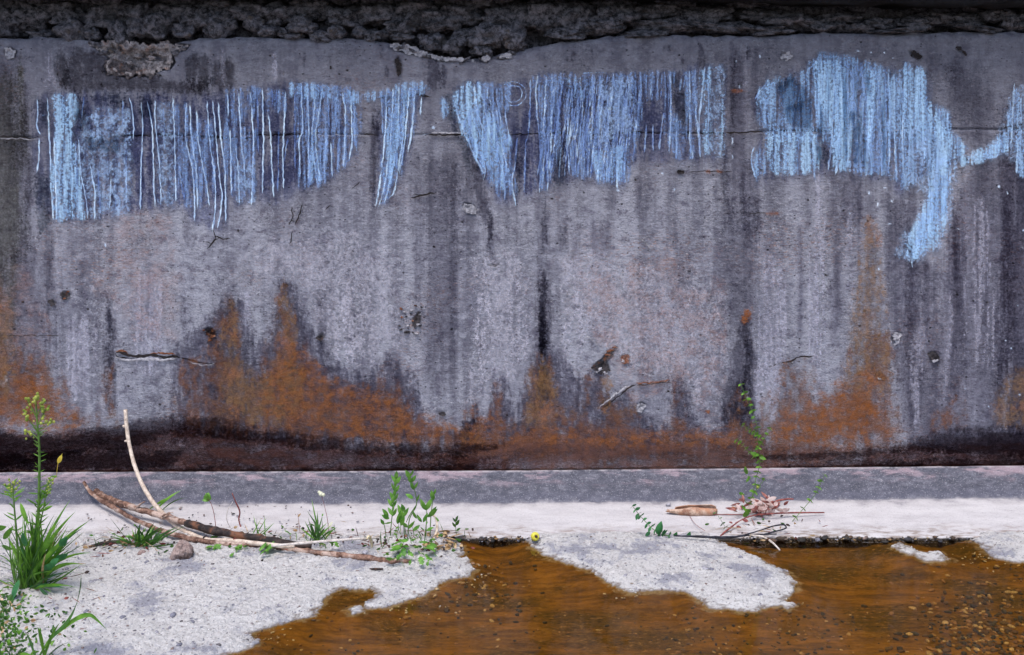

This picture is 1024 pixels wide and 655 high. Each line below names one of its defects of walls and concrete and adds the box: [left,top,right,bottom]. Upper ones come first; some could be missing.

spalling [88,40,188,80]
crack [115,349,214,366]
rust [0,260,1024,472]
spalling [591,346,630,375]
damp [0,415,497,472]
damp [756,428,1024,468]